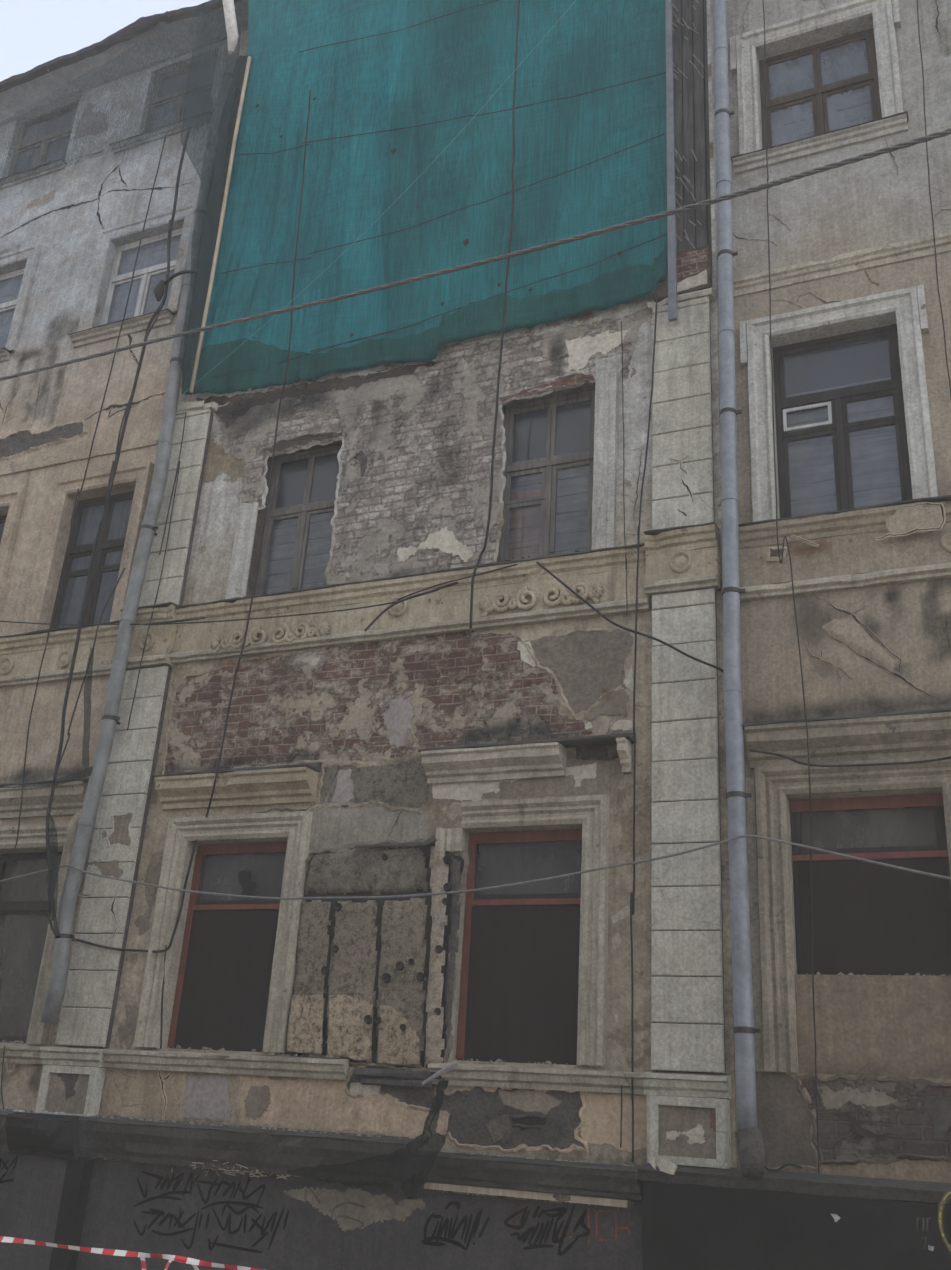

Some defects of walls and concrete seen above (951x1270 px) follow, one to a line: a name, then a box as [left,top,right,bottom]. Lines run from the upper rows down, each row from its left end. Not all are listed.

crack [934,0,945,43]
crack [0,145,192,239]
flaking render [177,304,653,585]
crack [803,593,935,698]
flaking render [162,627,635,1154]
flaking render [755,1071,951,1171]